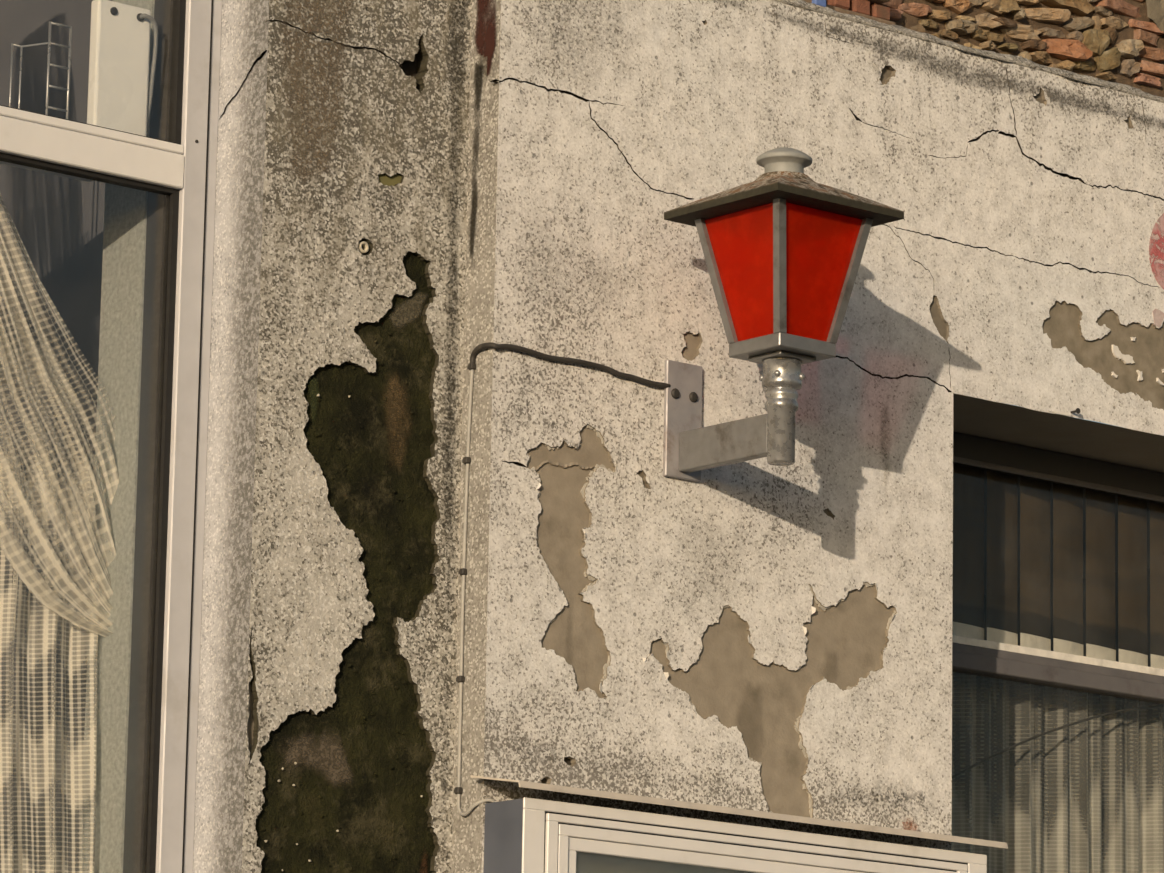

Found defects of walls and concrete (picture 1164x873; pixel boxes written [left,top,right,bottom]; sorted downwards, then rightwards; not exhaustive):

crack [219,50,267,119]
crack [266,20,402,67]
spalling [400,34,429,94]
crack [490,78,693,200]
crack [849,68,1164,201]
crack [882,224,1160,288]
crack [834,351,952,392]
spalling [929,295,949,344]
peeling [1042,300,1164,410]
peeling [526,424,617,698]
spalling [247,627,282,765]
peeling [643,582,897,818]